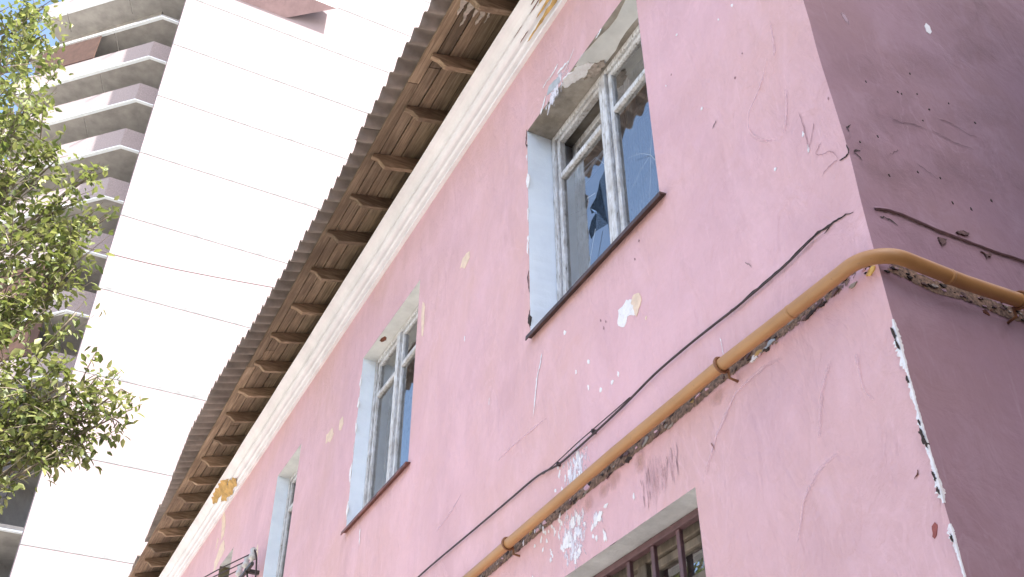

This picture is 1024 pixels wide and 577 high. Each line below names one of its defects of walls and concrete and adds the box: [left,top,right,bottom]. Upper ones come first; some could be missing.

spalling [540,0,638,115]
spalling [478,264,1024,577]
spalling [212,477,237,572]